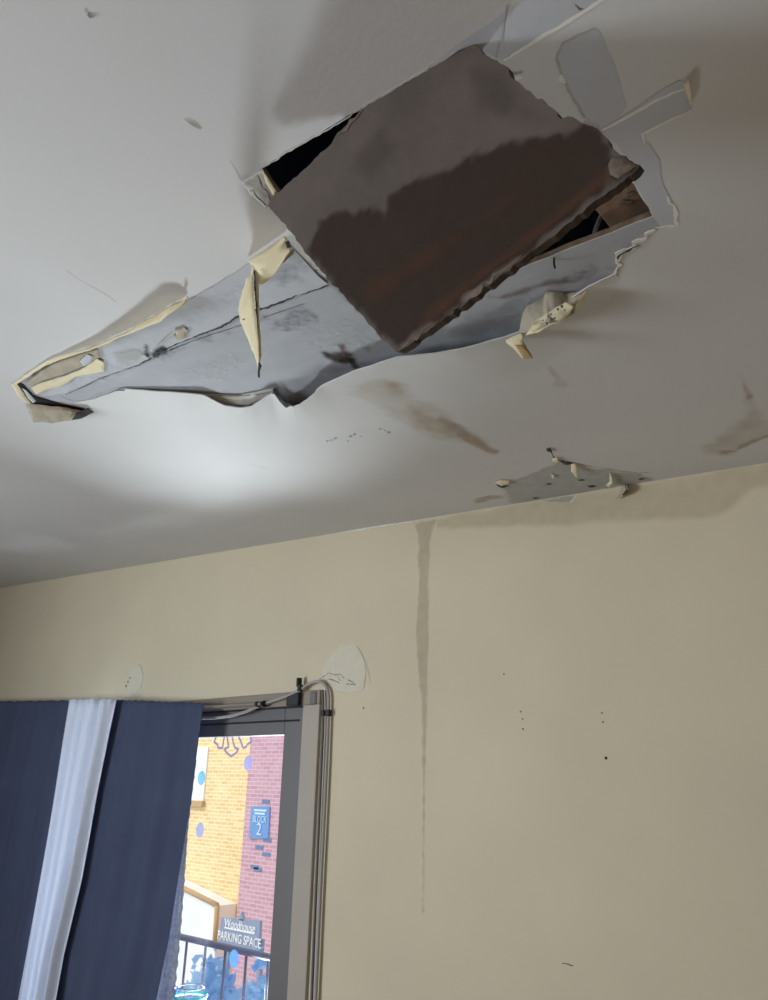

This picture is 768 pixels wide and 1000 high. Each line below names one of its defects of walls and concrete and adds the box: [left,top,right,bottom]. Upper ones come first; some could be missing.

peeling [250,44,468,176]
leakage [309,124,609,344]
peeling [608,157,636,179]
peeling [11,217,660,424]
peeling [496,463,644,503]